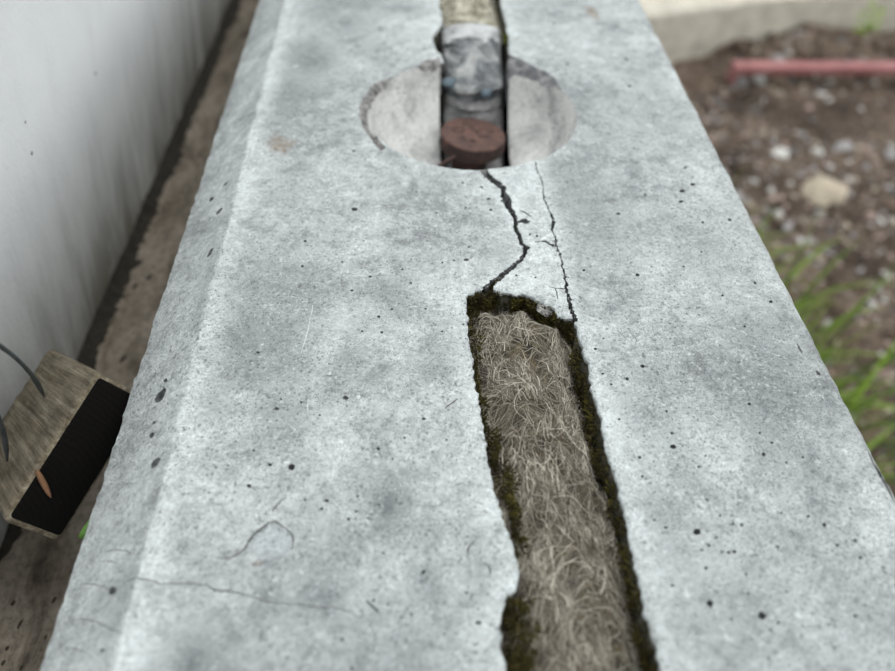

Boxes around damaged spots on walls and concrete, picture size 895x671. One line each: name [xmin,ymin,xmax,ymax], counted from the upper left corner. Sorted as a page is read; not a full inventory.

crack [480,163,578,328]